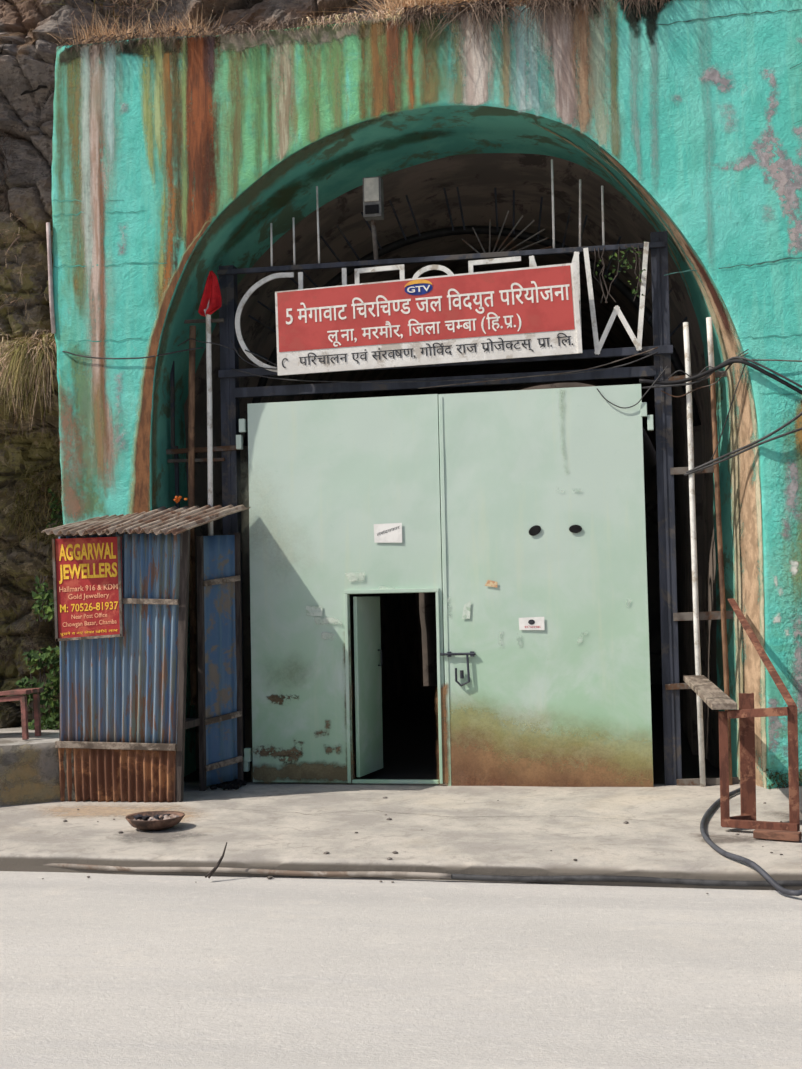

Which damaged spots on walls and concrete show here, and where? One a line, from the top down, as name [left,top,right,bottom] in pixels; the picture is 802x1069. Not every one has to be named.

corrosion [57,57,92,304]
corrosion [129,19,446,514]
water stain [414,0,661,232]
peeling [701,68,732,92]
crack [656,9,802,25]
peeling [722,69,802,253]
corrosion [59,388,83,520]
corrosion [596,148,766,788]
corrosion [252,684,354,784]
corrosion [436,684,653,787]